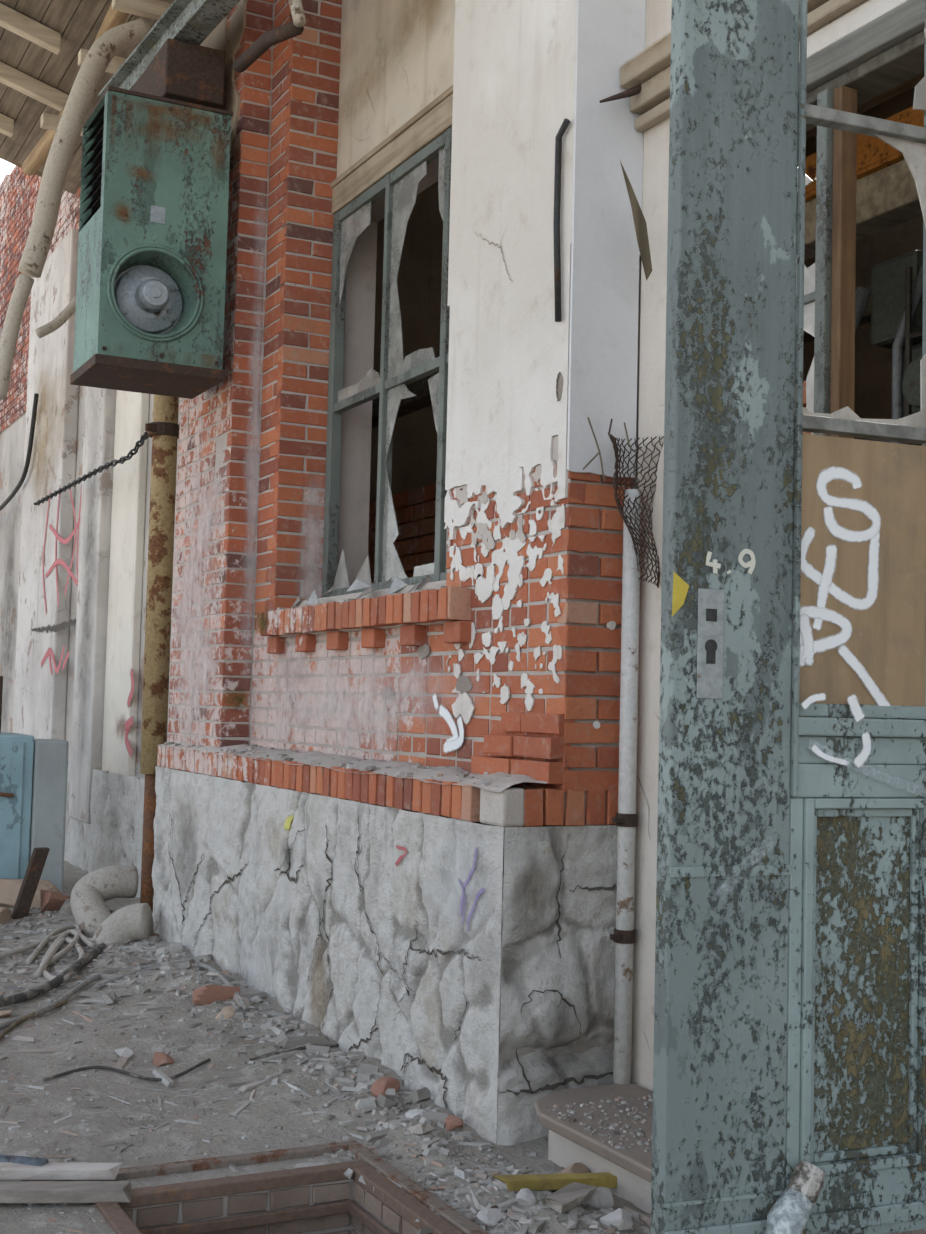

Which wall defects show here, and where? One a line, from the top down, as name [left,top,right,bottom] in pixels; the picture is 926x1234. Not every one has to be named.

peeling [200,0,248,150]
peeling [446,436,565,724]
crack [168,801,481,1050]
crack [555,851,617,959]
crack [521,990,581,1034]
crack [398,1053,448,1109]
crack [499,1048,613,1096]